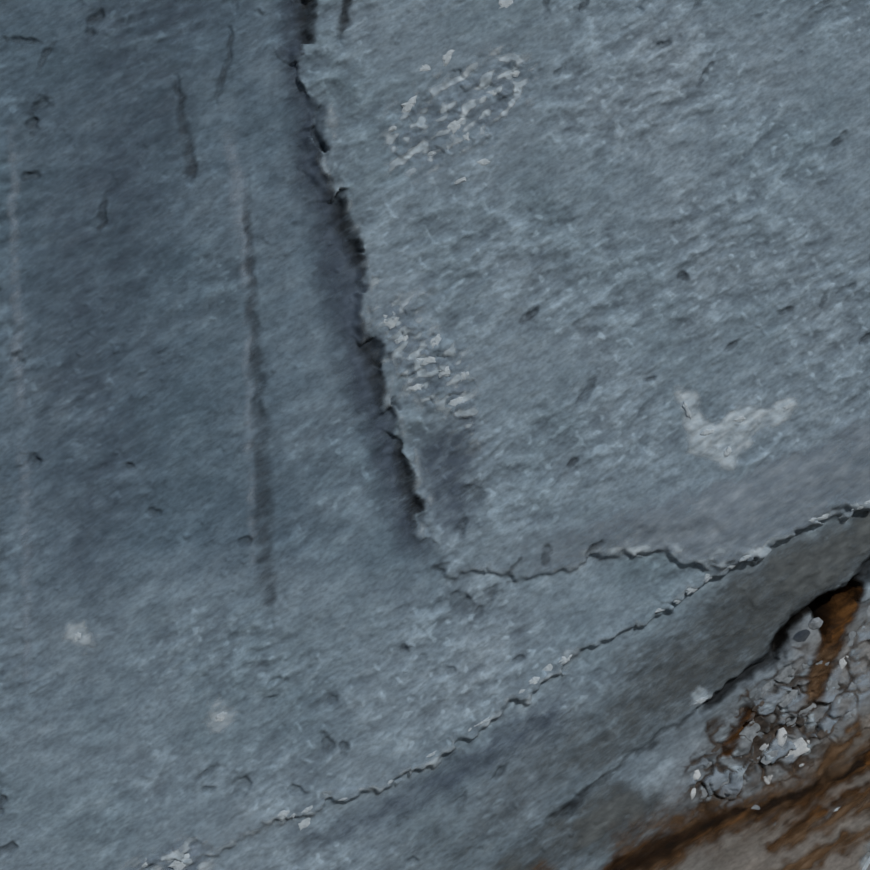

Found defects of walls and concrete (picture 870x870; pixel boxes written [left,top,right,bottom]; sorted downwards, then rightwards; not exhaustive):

spalling [368,292,478,525]
crack [561,775,604,814]
rust [602,719,870,870]
rust [722,708,754,757]
spalling [685,605,870,816]
crack [704,557,870,706]
rust [806,584,863,701]